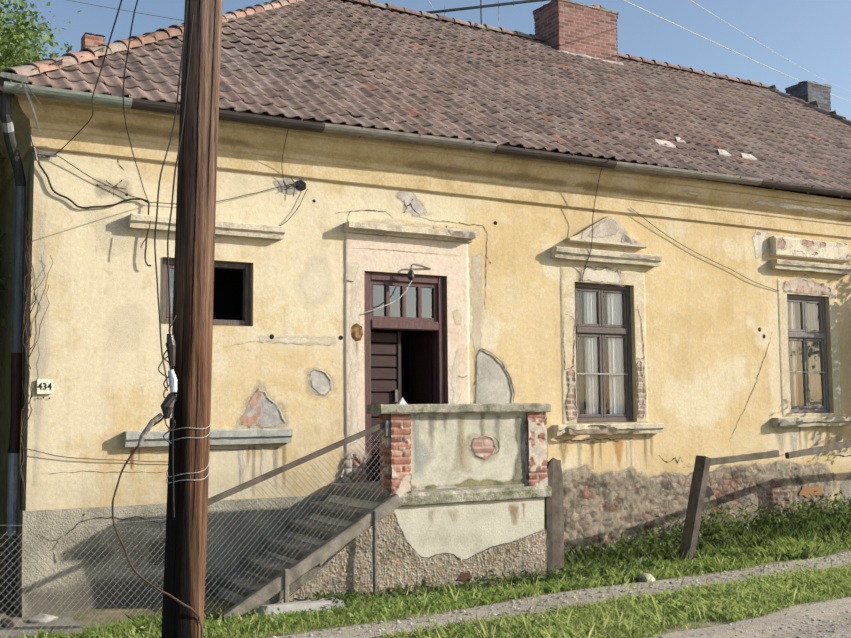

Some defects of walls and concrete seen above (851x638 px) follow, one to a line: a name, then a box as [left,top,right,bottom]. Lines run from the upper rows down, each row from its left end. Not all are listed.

flaking render [397,191,427,216]
crack [335,199,491,297]
peeling [753,230,849,265]
crack [28,0,243,592]
flaking render [470,254,514,404]
flaking render [783,278,832,295]
flaking render [236,384,287,429]
flaking render [307,369,332,396]
flaking render [565,360,646,435]
flaking render [563,464,693,555]
flaking render [700,460,838,531]
flaking render [280,512,547,603]